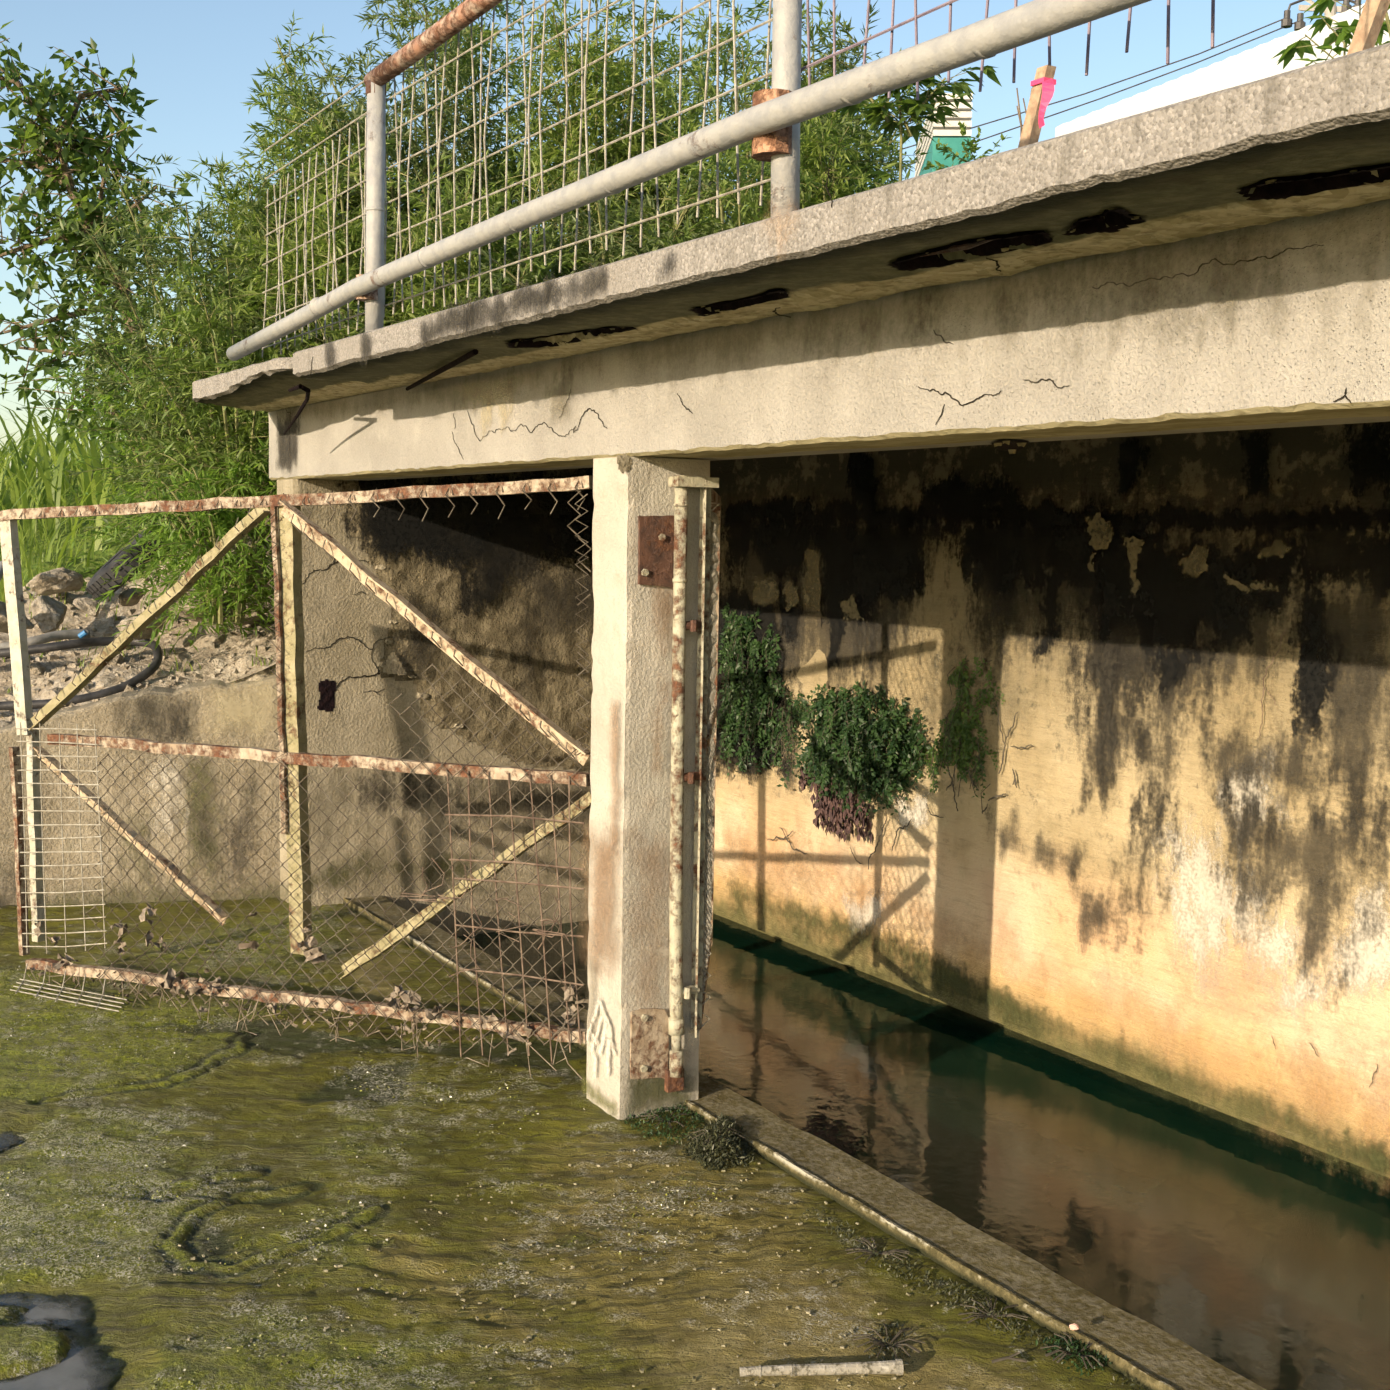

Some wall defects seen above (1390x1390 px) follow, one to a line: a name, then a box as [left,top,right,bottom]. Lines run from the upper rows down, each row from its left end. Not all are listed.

spalling [1235,163,1390,201]
spalling [888,208,1146,271]
crack [1092,244,1323,289]
spalling [689,288,790,317]
crack [452,390,605,460]
crack [918,378,1069,425]
crack [309,636,385,695]
water stain [716,422,1390,1009]